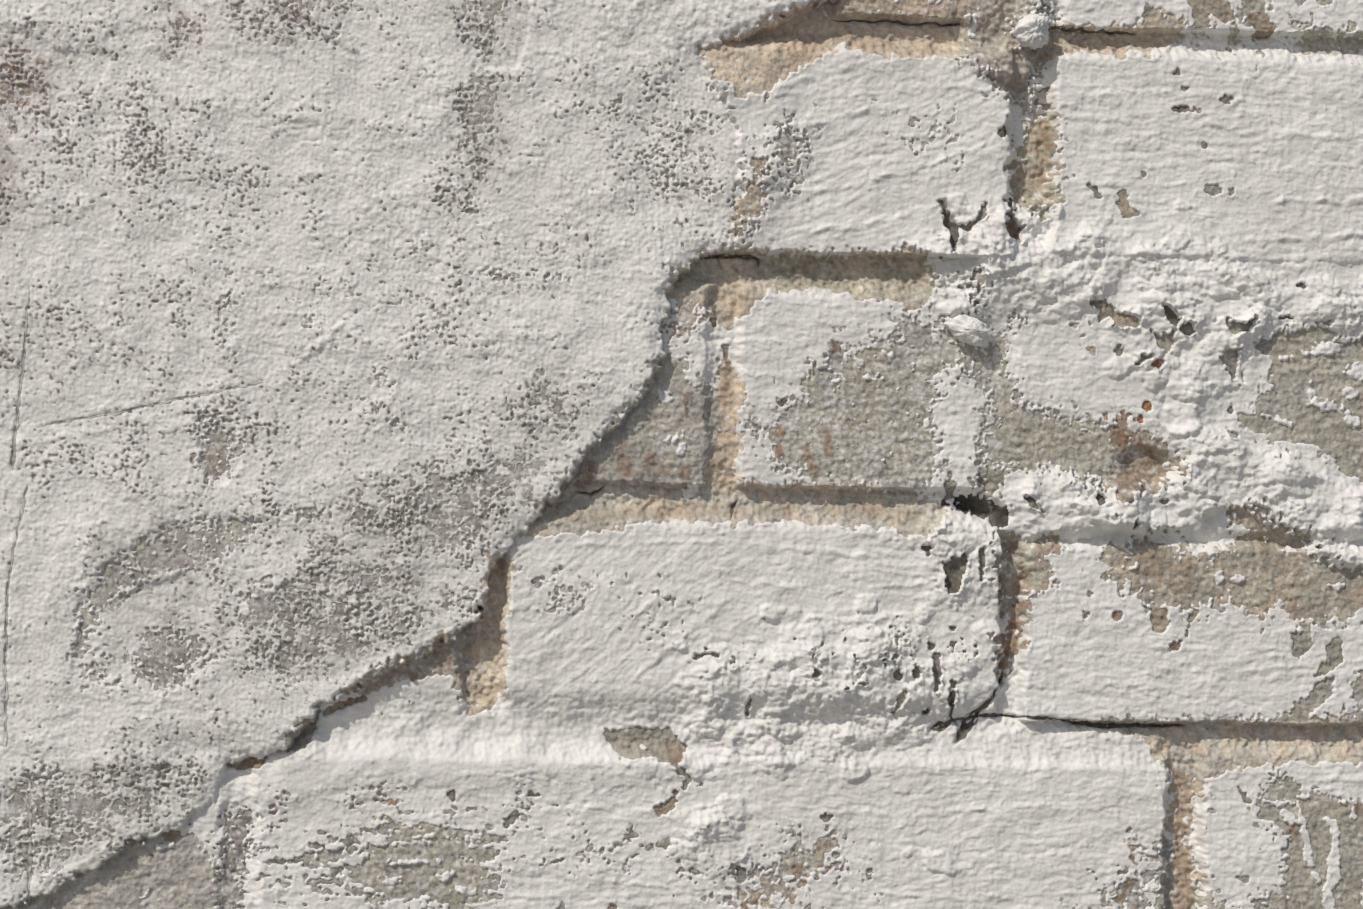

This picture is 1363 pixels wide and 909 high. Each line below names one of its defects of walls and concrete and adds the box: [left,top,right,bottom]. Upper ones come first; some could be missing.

peeling [587,91,824,243]
spalling [806,0,1069,172]
peeling [209,262,263,345]
peeling [739,269,1195,530]
peeling [1219,316,1363,482]
peeling [66,296,736,752]
peeling [883,626,978,713]
peeling [921,546,985,593]
crack [930,671,1182,743]
peeling [1083,498,1363,723]
flaking render [0,747,883,909]
peeling [1192,768,1363,909]